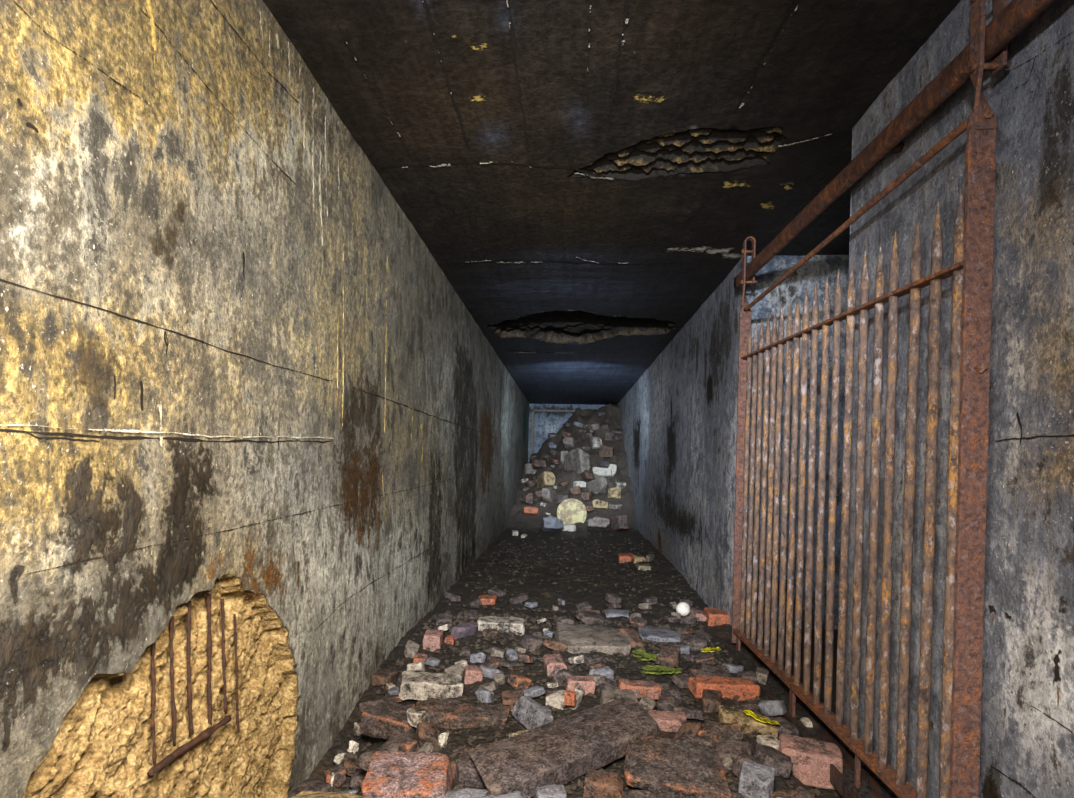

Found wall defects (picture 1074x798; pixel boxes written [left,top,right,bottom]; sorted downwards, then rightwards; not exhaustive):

spalling [567,127,787,182]
spalling [487,310,678,344]
crack [0,278,497,438]
crack [0,424,333,443]
crack [996,413,1074,444]
rust [331,439,387,552]
leakage [8,565,25,605]
spalling [23,574,363,798]
leakage [2,698,12,751]